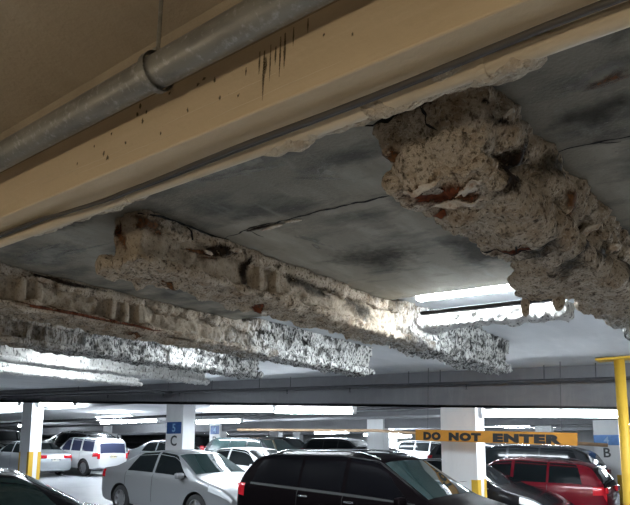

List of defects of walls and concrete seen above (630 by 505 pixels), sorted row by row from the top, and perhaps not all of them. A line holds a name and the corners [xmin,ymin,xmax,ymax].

spalling [488,138,528,199]
crack [137,195,389,240]
rust [403,178,483,219]
spalling [204,245,242,257]
spalling [238,255,256,289]
spalling [287,276,334,297]
rust [18,301,161,339]
spalling [348,301,374,318]